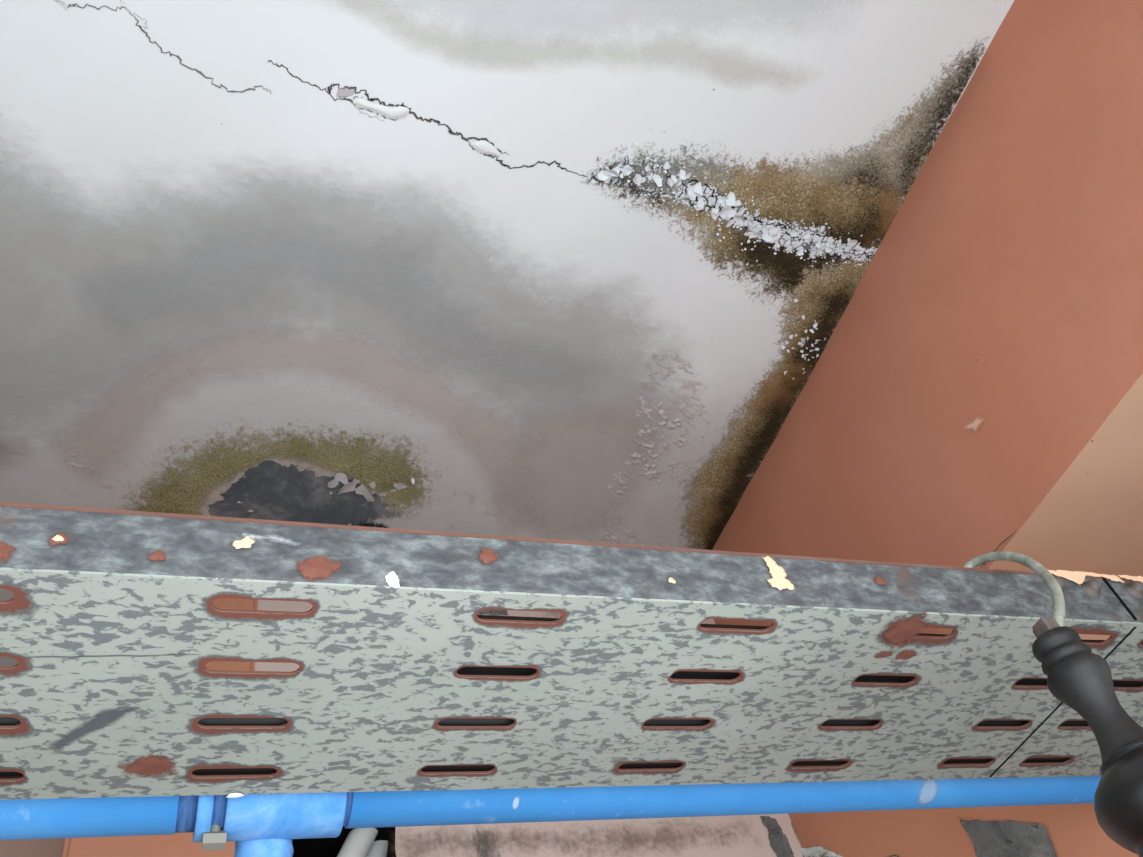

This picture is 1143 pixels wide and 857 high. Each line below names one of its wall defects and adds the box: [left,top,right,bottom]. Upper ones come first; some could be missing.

crack [56,0,588,177]
leakage [583,38,988,550]
spalling [199,457,415,528]
corrosion [0,541,15,562]
corrosion [297,555,341,581]
corrosion [0,583,39,616]
corrosion [202,592,320,623]
corrosion [851,613,958,690]
corrosion [119,755,285,784]
peeling [760,816,842,857]